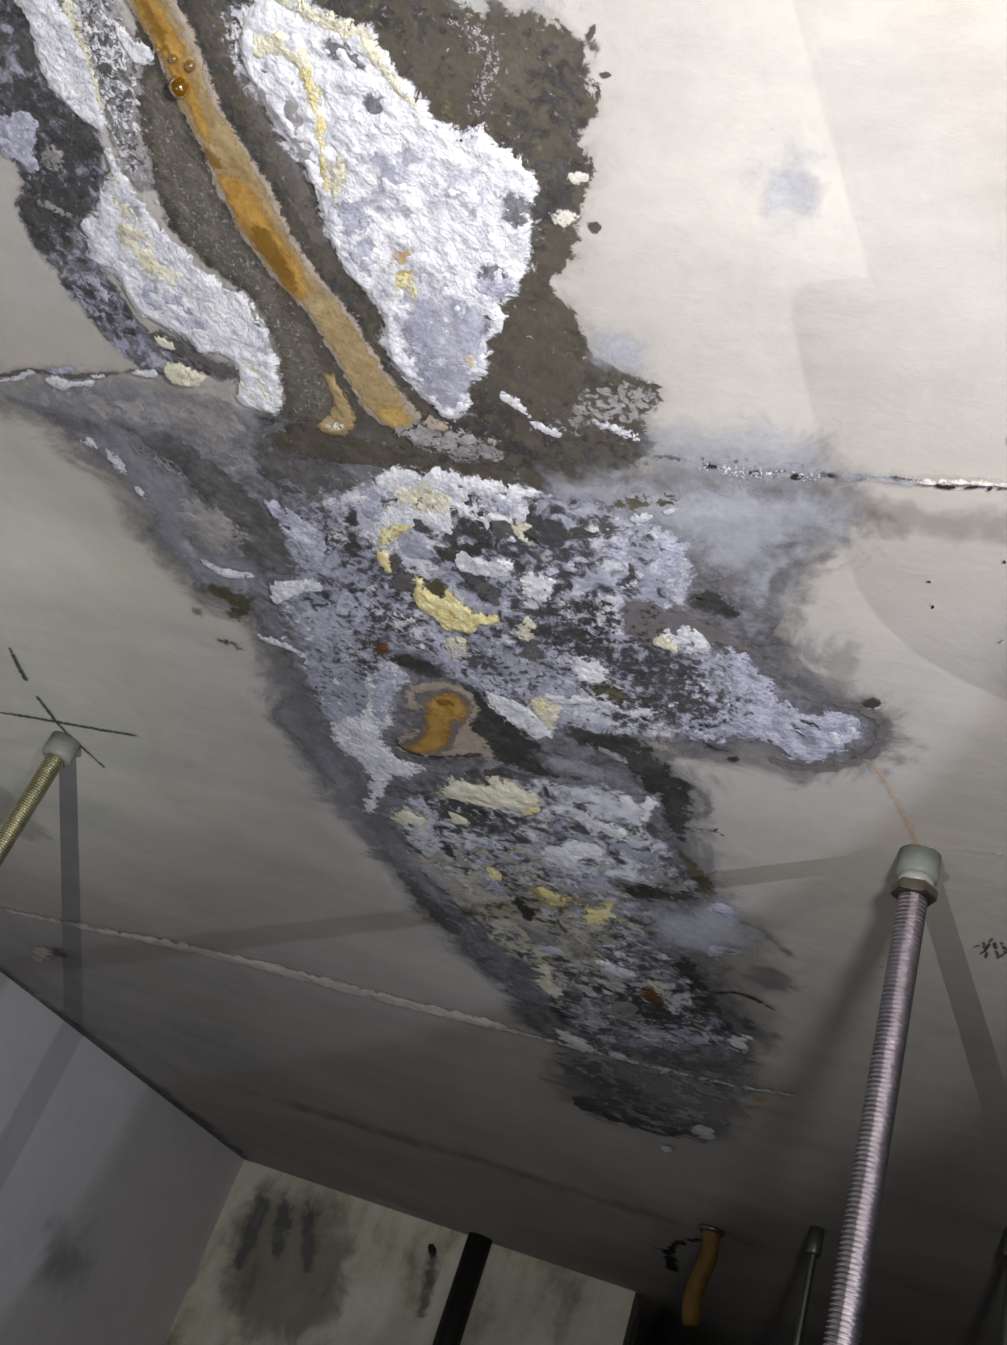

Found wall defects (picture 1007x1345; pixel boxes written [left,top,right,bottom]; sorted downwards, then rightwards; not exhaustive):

rust [126,0,422,428]
crack [0,365,163,391]
crack [652,455,1007,491]
leakage [0,0,895,1154]
rust [389,654,498,761]
spalling [863,698,884,710]
leakage [235,1197,314,1272]